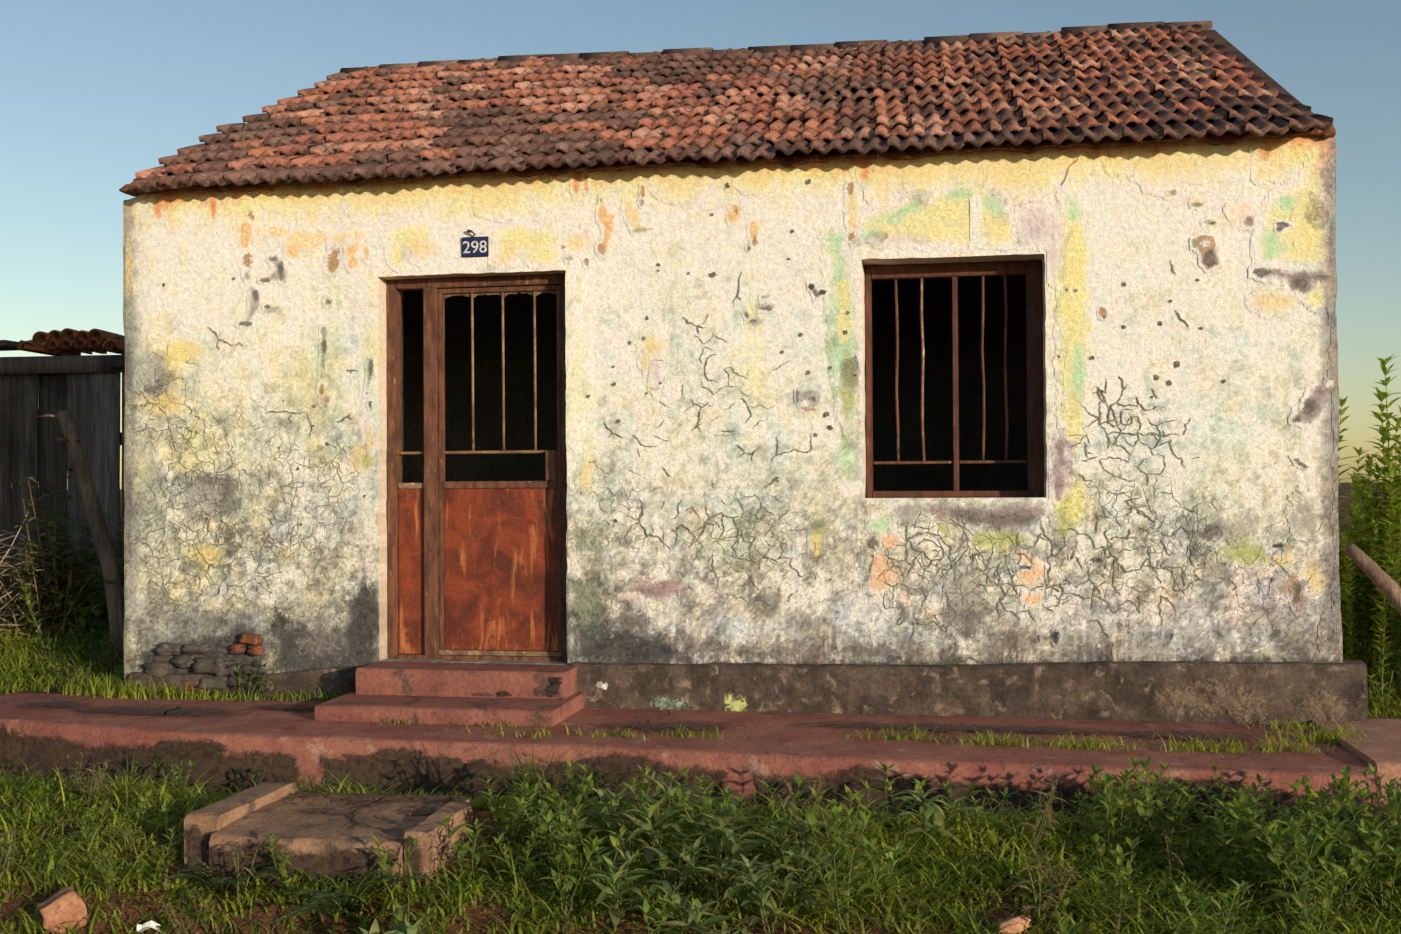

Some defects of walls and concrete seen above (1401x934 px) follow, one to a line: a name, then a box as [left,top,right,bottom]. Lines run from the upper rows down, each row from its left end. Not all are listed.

peeling [232,209,375,330]
peeling [818,175,1024,265]
leakage [126,461,141,571]
leakage [178,460,254,528]
crack [127,327,356,627]
crack [570,271,816,617]
leakage [568,433,1340,665]
crack [857,376,1325,664]
flaking render [134,619,273,693]
leakage [258,567,378,673]
leakage [599,696,741,731]
leakage [803,681,1275,741]